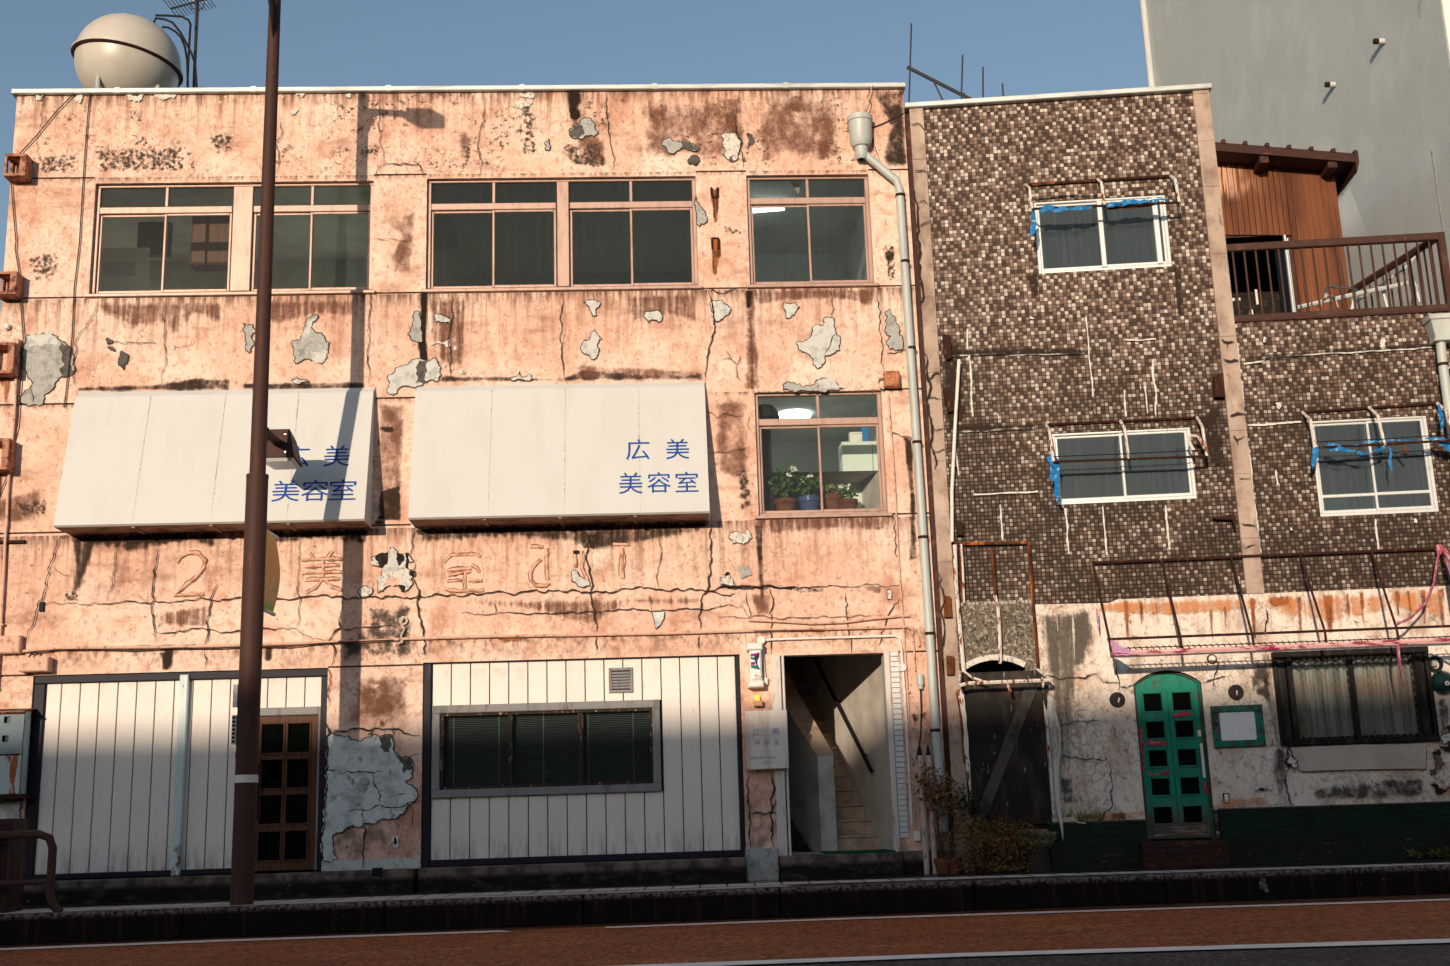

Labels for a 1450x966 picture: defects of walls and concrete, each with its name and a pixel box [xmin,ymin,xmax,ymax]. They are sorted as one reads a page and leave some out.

water stain [564,91,605,167]
water stain [648,99,743,155]
peeling [721,132,755,162]
water stain [761,96,837,160]
water stain [879,92,906,165]
spalling [17,333,76,406]
spalling [782,316,843,393]
spalling [357,547,416,598]
corrosion [1099,589,1444,638]
crack [26,515,902,860]
peeling [319,733,419,863]
crack [360,826,368,869]